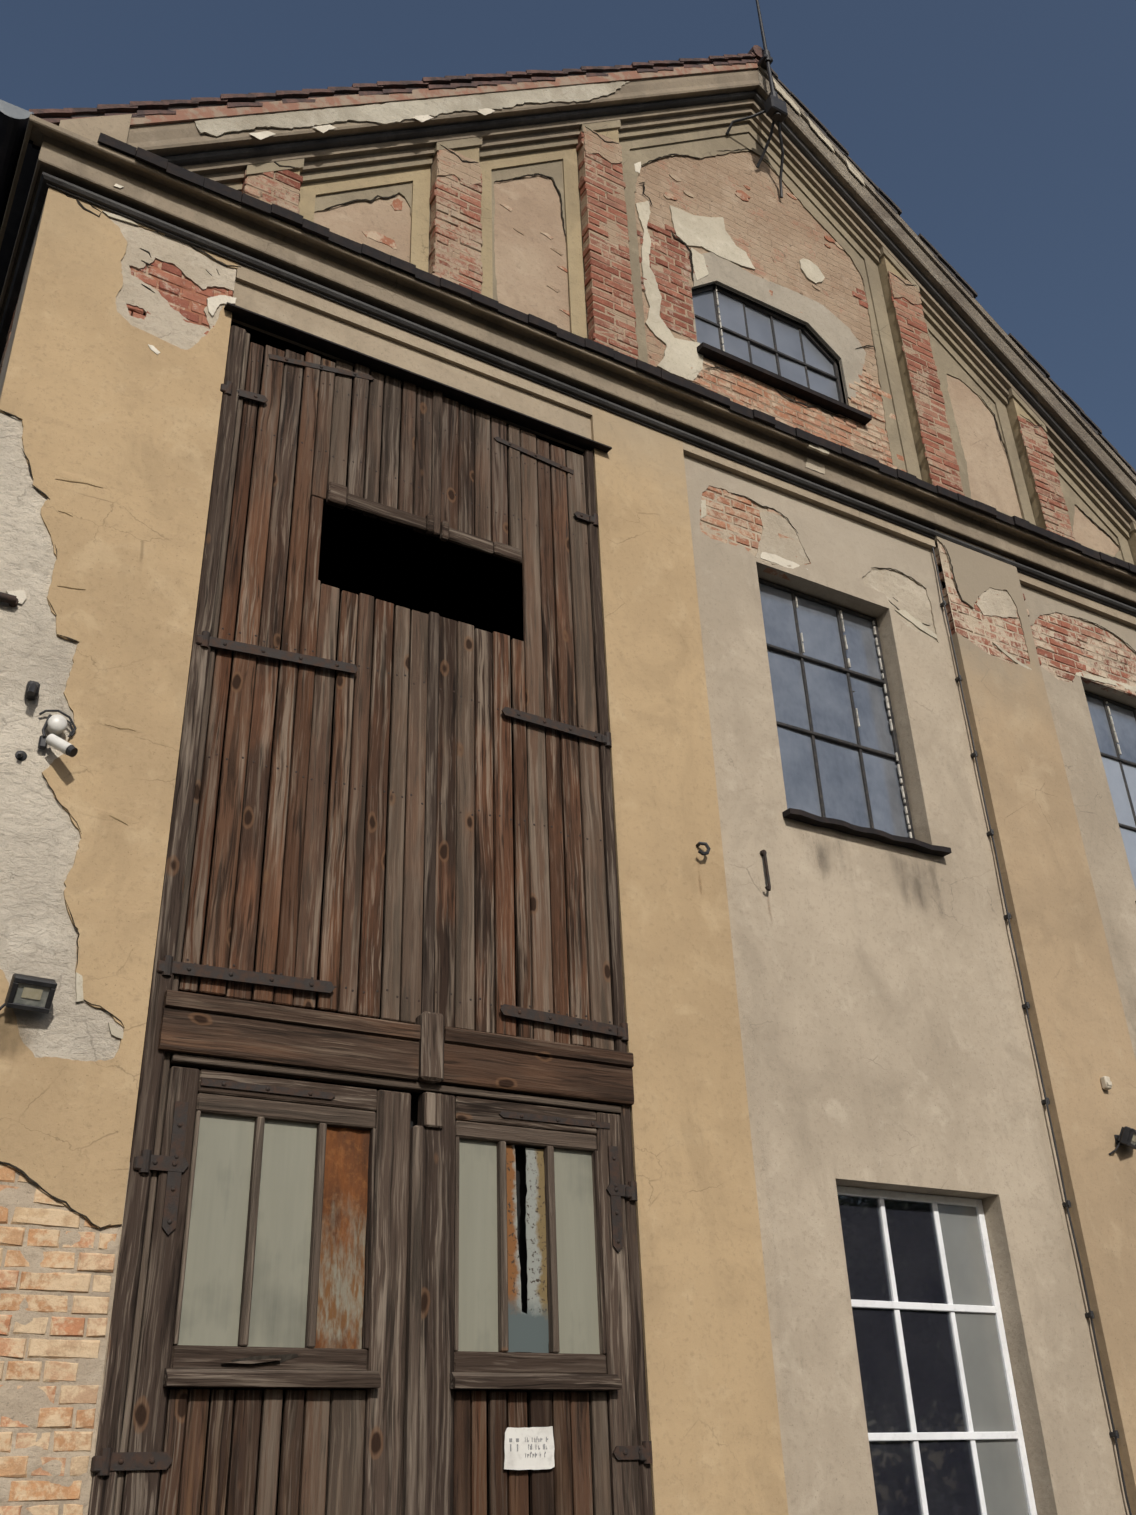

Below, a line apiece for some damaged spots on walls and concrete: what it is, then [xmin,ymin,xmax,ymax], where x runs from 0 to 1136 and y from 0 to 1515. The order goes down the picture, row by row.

peeling [194,81,629,140]
flaking render [102,211,241,355]
flaking render [241,161,411,263]
flaking render [429,127,906,474]
flaking render [888,271,1022,518]
flaking render [700,486,811,581]
flaking render [1017,414,1120,556]
flaking render [862,540,1136,699]
flaking render [0,410,125,1061]
rust [314,1126,370,1349]
flaking render [0,1161,130,1515]